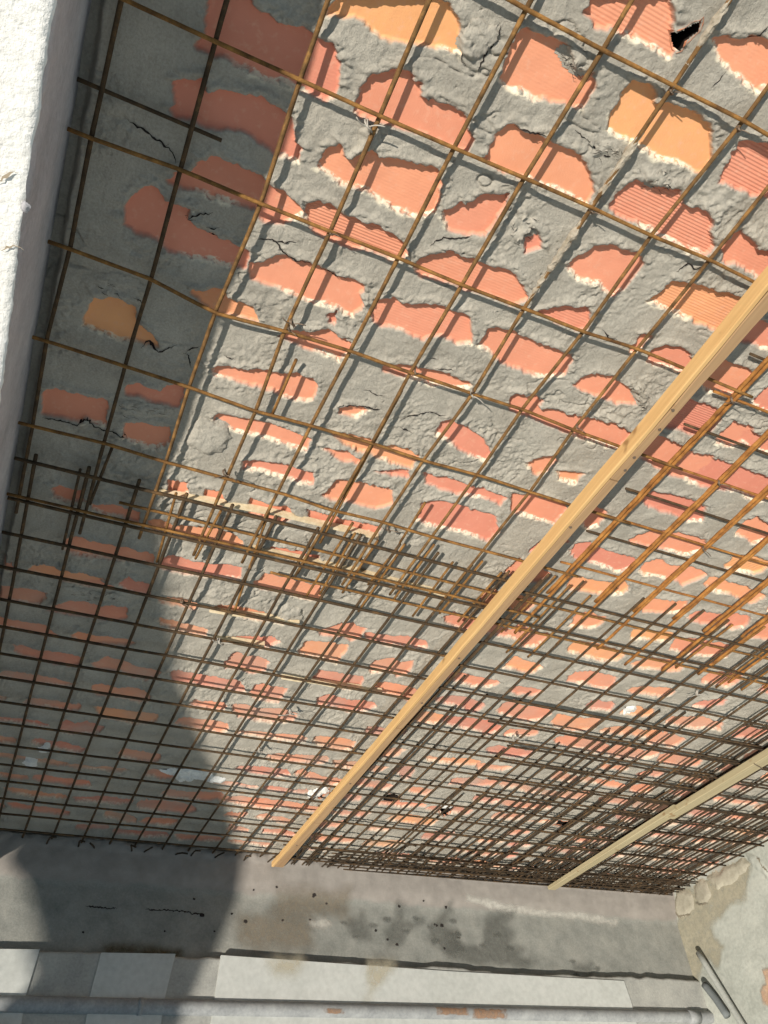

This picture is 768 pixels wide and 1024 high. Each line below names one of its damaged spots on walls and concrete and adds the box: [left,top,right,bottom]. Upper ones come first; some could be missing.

spalling [668,17,704,53]
crack [128,120,176,162]
spalling [637,162,686,190]
crack [185,212,218,236]
spalling [504,213,550,245]
crack [260,238,344,278]
crack [141,340,200,368]
crack [46,417,127,438]
spalling [291,352,768,918]
damp [433,896,617,964]